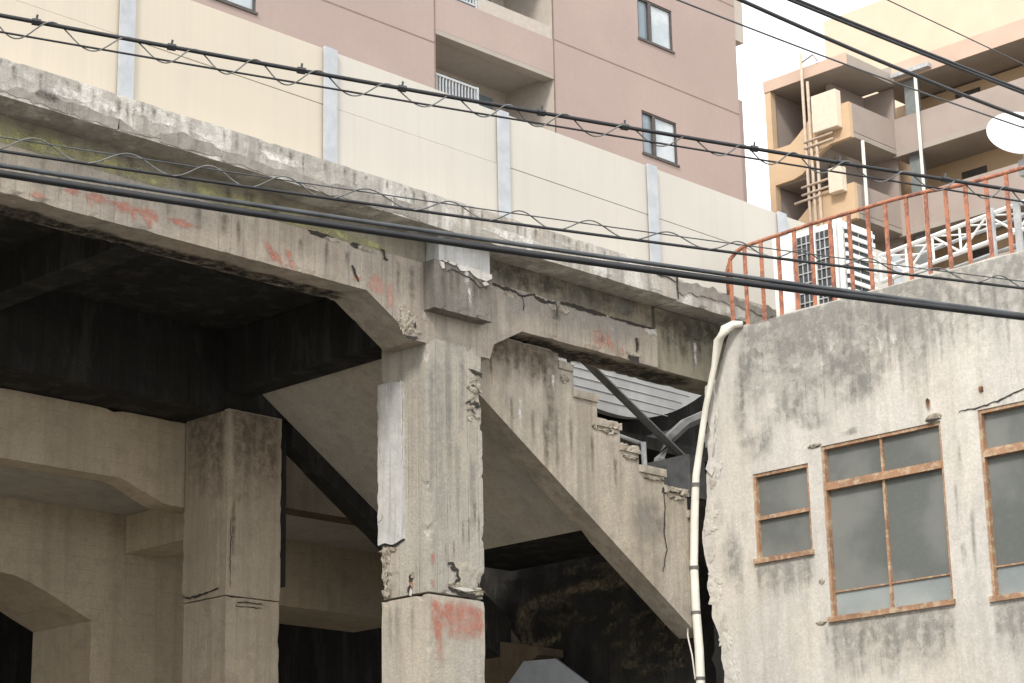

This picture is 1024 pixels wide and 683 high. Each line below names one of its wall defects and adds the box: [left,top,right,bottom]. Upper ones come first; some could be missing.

peeling [0,70,429,223]
spalling [308,230,375,252]
peeling [483,225,537,244]
spalling [397,304,422,340]
crack [447,269,654,351]
leakage [742,254,1024,386]
peeling [704,383,723,489]
crack [959,388,1024,412]
peeling [377,380,405,599]
crack [592,424,685,572]
spalling [448,561,484,599]
spalling [703,502,740,683]